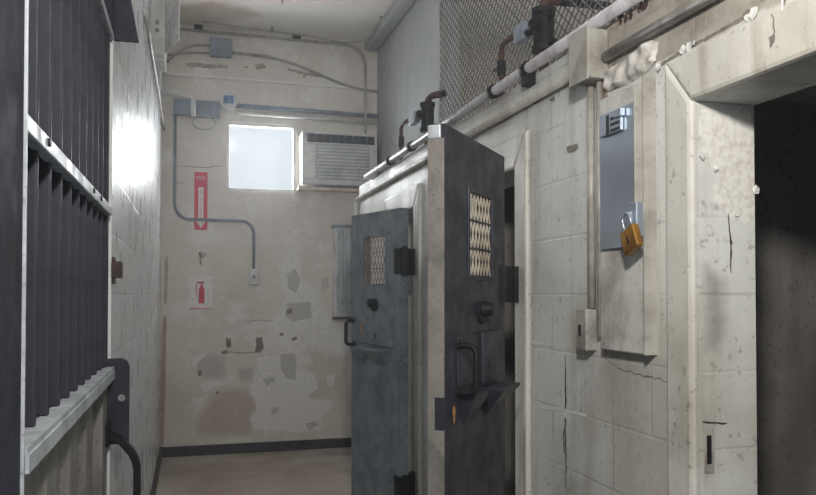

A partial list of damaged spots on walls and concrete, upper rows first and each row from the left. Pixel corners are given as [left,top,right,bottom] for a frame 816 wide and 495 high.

crack [726,213,734,272]
peeling [249,252,352,434]
crack [561,356,569,487]
crack [605,350,667,382]